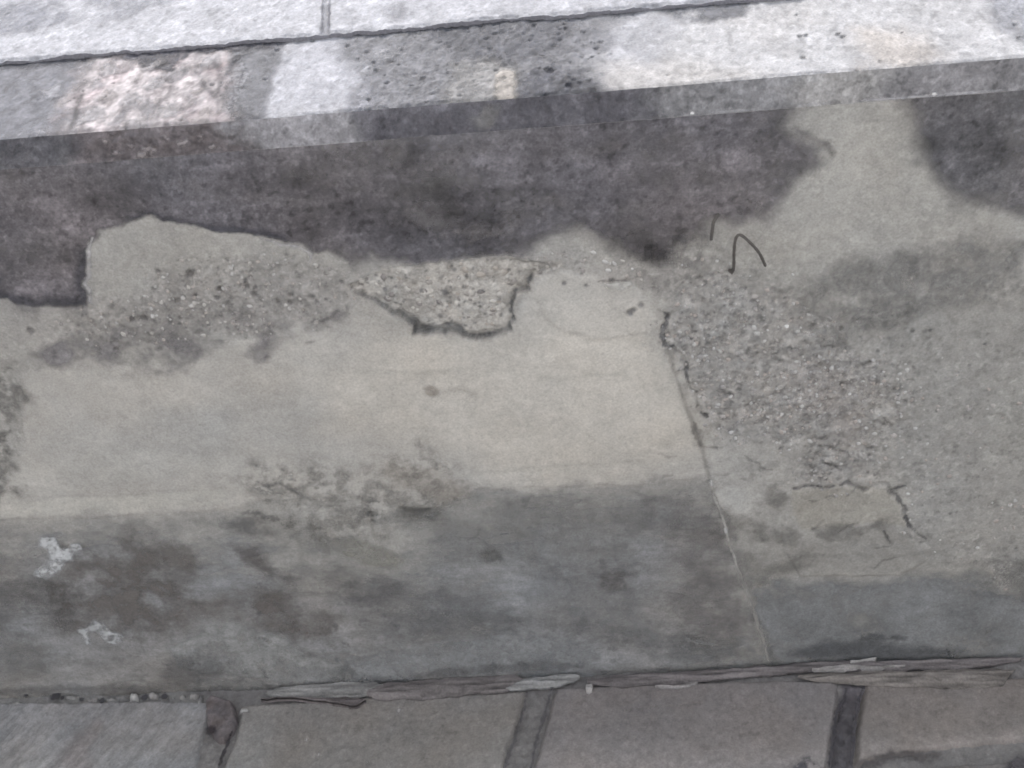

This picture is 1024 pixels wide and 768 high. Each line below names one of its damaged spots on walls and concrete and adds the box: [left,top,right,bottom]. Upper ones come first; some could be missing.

water stain [0,3,817,307]
water stain [870,90,1024,211]
spalling [79,250,645,346]
water stain [0,384,29,416]
spalling [650,257,941,500]
crack [793,437,865,491]
crack [891,485,911,527]
water stain [0,468,1024,698]